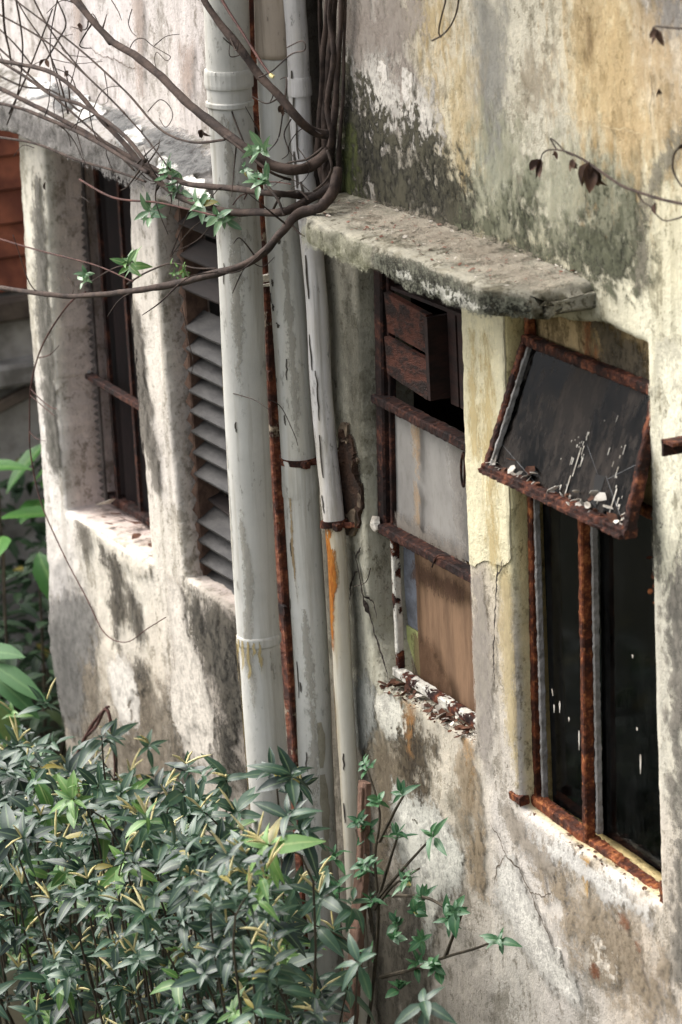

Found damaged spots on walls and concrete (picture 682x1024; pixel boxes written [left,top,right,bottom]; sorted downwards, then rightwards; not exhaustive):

leakage [331,47,491,236]
leakage [493,155,540,259]
leakage [583,170,618,247]
spalling [337,422,365,536]
leakage [74,519,150,749]
rust [325,529,339,651]
crack [492,560,503,687]
rust [404,700,415,753]
leakage [368,714,440,1024]
crack [489,820,556,952]